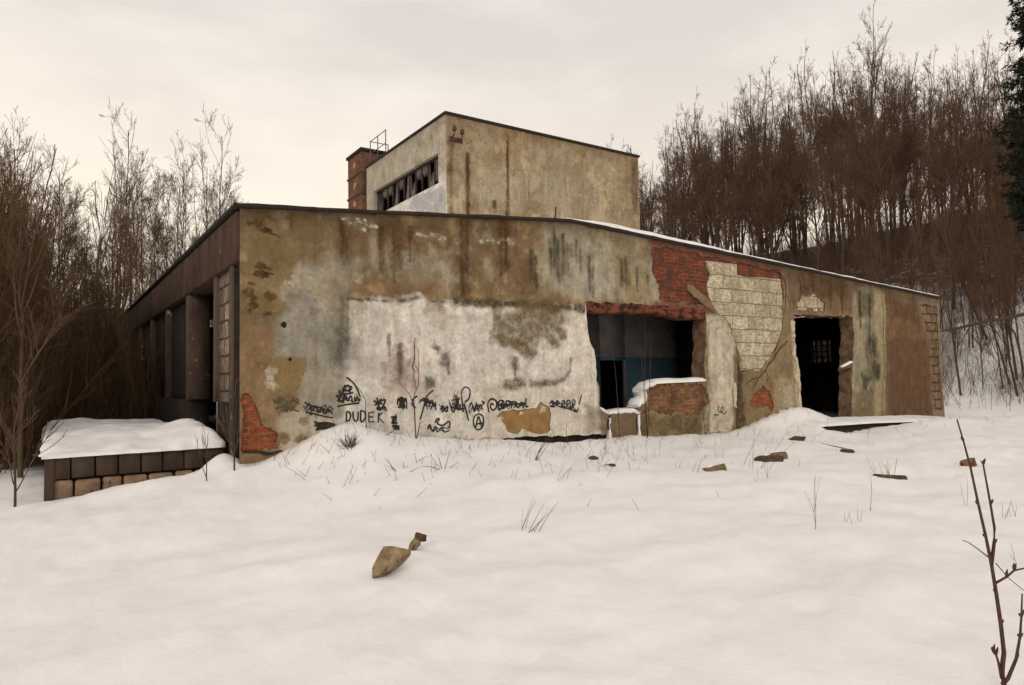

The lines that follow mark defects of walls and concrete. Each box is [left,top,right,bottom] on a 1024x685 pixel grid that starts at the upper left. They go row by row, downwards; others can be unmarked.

flaking render [651,247,783,305]
spalling [240,393,311,452]
peeling [497,402,551,434]
spalling [750,385,773,411]
crack [736,341,788,426]
spalling [790,293,825,407]
leakage [862,339,879,390]